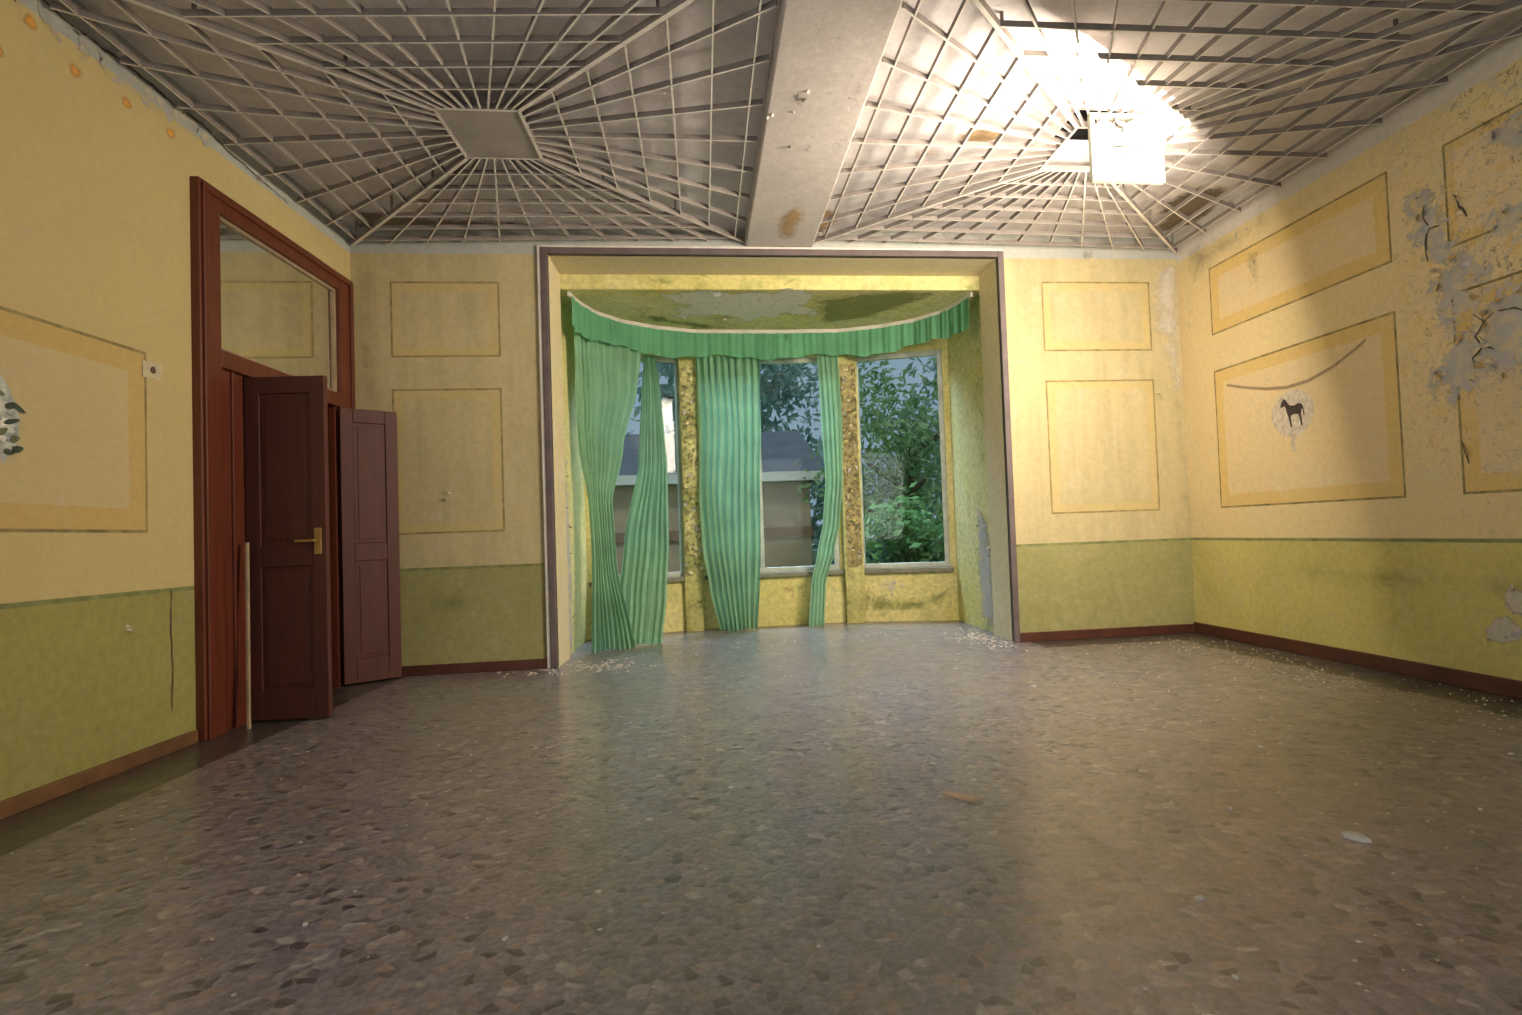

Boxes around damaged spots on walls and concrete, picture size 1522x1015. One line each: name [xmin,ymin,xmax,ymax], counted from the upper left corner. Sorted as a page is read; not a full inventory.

peeling [1402,179,1522,413]
flaking render [1486,584,1522,644]